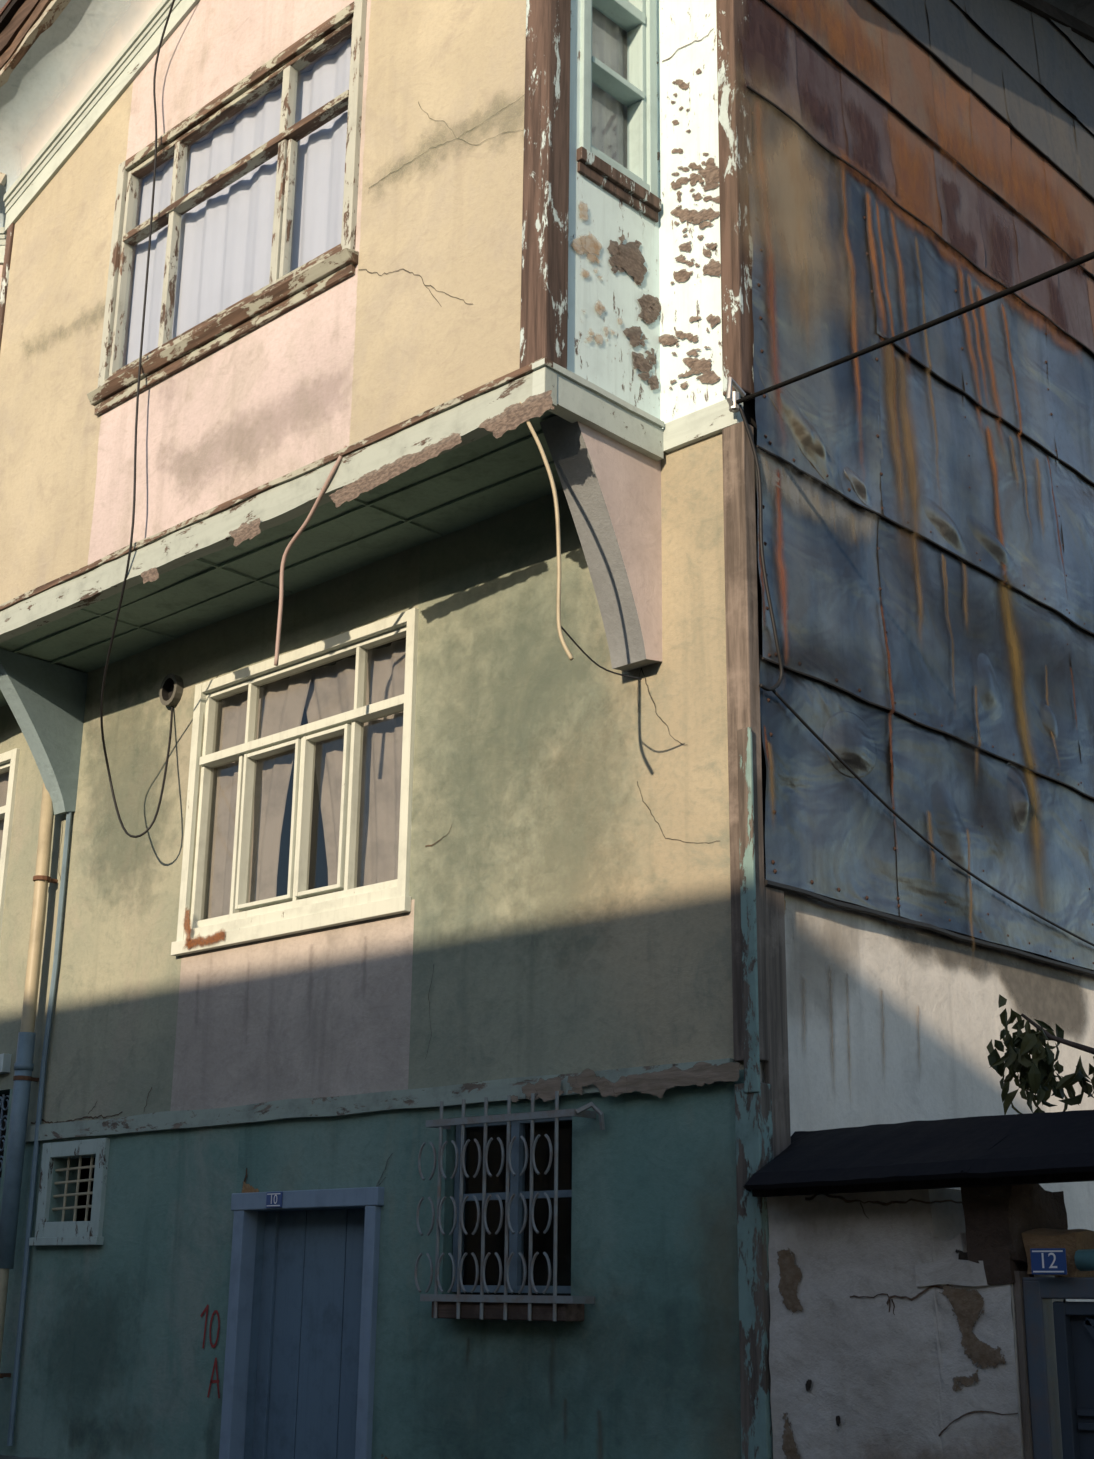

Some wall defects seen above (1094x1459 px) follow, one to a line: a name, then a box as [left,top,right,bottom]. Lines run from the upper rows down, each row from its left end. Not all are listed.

peeling [657,68,721,284]
crack [358,269,467,307]
peeling [571,202,720,390]
peeling [329,433,462,508]
peeling [479,390,554,438]
corrosion [841,154,1074,627]
corrosion [942,555,967,682]
corrosion [880,601,897,843]
corrosion [1000,564,1040,864]
peeling [511,1062,740,1102]
crack [850,1284,949,1315]
flaking render [939,1285,1006,1392]